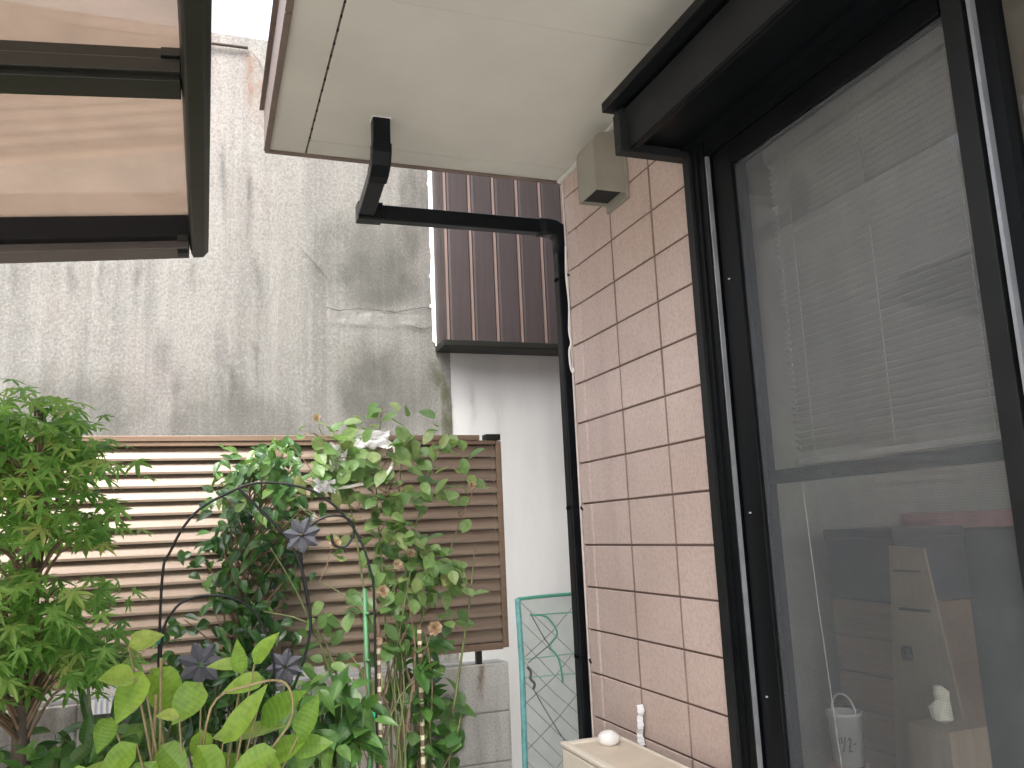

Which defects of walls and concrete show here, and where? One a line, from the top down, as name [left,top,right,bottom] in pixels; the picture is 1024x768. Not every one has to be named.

crack [304,252,434,329]